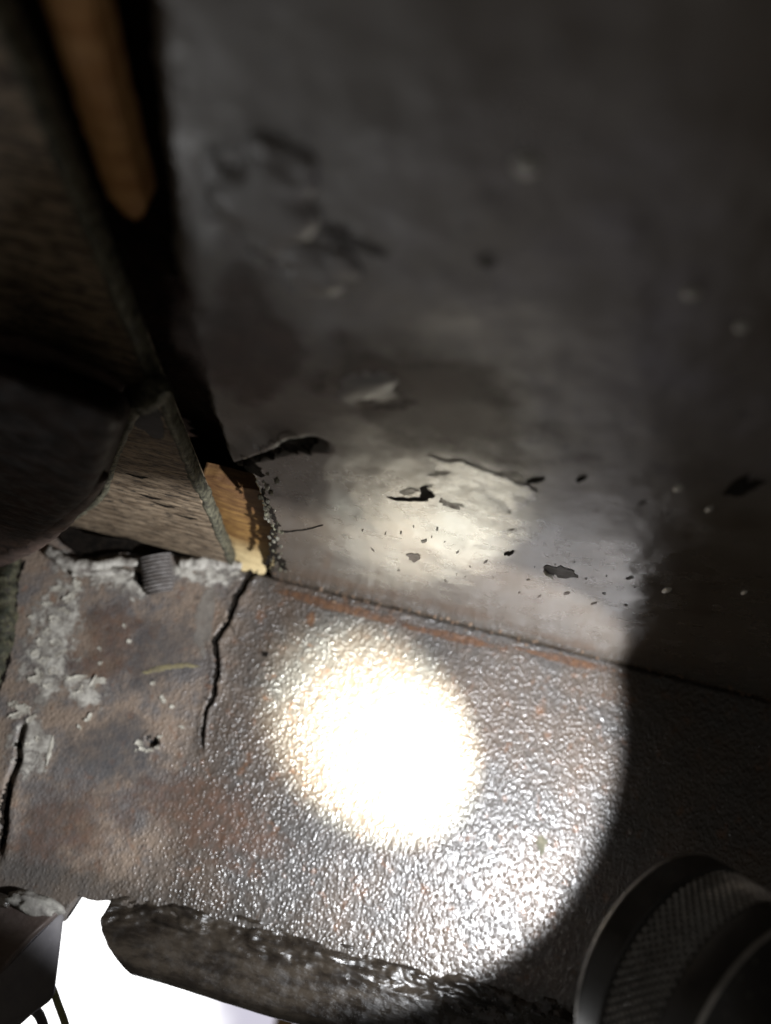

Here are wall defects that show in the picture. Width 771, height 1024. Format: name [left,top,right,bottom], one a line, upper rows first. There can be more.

peeling [399,457,545,517]
crack [200,431,323,748]
peeling [543,566,578,579]
rust [279,590,602,671]
crack [0,729,24,851]